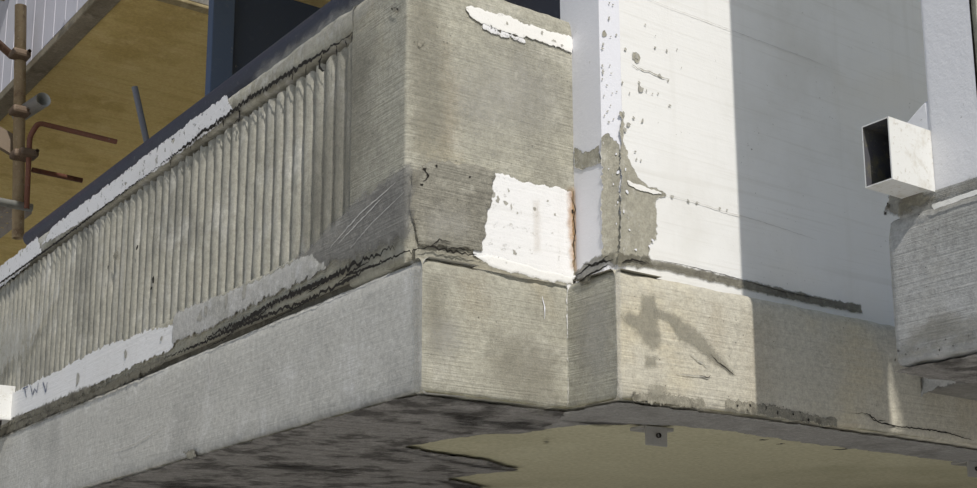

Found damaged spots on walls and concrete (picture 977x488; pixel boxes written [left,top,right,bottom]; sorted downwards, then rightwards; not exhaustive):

peeling [466,6,573,53]
crack [0,32,353,284]
peeling [573,64,666,264]
peeling [473,173,575,279]
crack [164,238,475,359]
crack [542,256,832,360]
peeling [11,325,174,419]
crack [854,413,971,440]